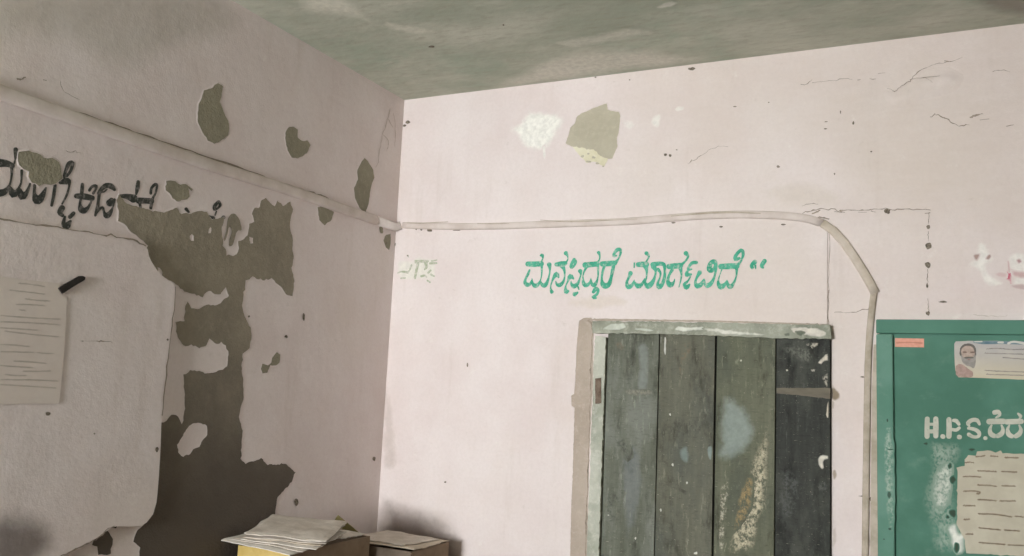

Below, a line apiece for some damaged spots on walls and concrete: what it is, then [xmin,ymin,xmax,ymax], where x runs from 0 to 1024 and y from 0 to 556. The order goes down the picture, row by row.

crack [801,57,962,92]
peeling [16,149,63,188]
peeling [196,82,230,145]
peeling [284,125,311,160]
peeling [353,157,375,212]
damp [504,108,567,160]
flaking render [565,103,622,167]
crack [932,113,1011,127]
peeling [317,206,334,227]
flaking render [115,179,296,556]